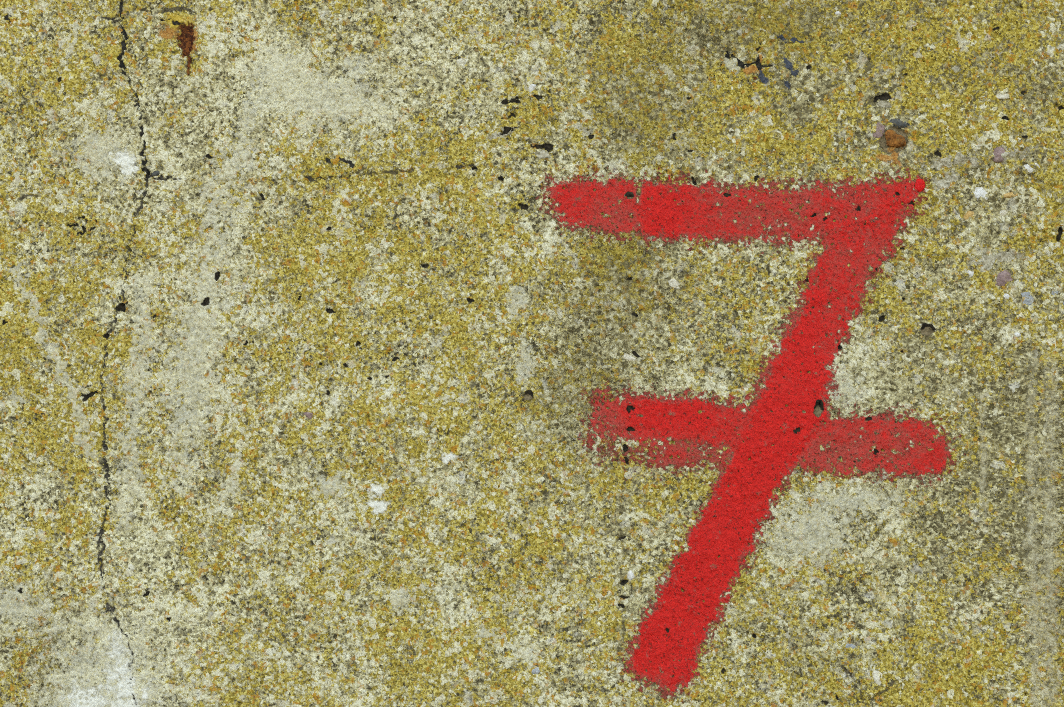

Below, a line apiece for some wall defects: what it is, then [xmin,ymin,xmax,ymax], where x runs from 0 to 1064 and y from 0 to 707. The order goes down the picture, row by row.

rust [158,22,198,76]
crack [305,157,414,181]
crack [92,0,181,703]